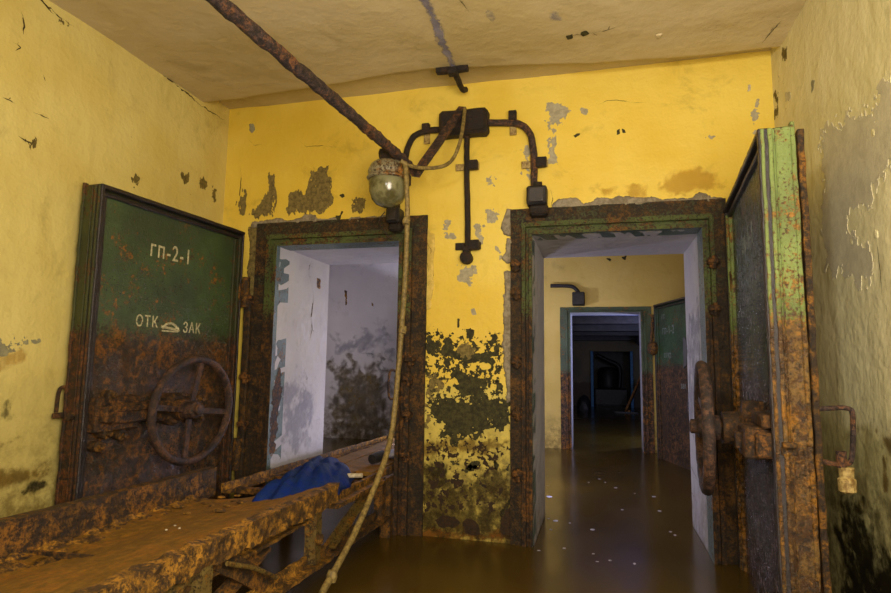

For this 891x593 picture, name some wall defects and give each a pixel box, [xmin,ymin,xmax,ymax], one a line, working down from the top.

peeling [544,102,588,165]
peeling [817,75,891,291]
peeling [236,165,386,295]
peeling [0,336,41,357]
leakage [327,353,393,439]
leakage [0,470,45,493]
leakage [423,465,510,543]
leakage [834,496,891,593]